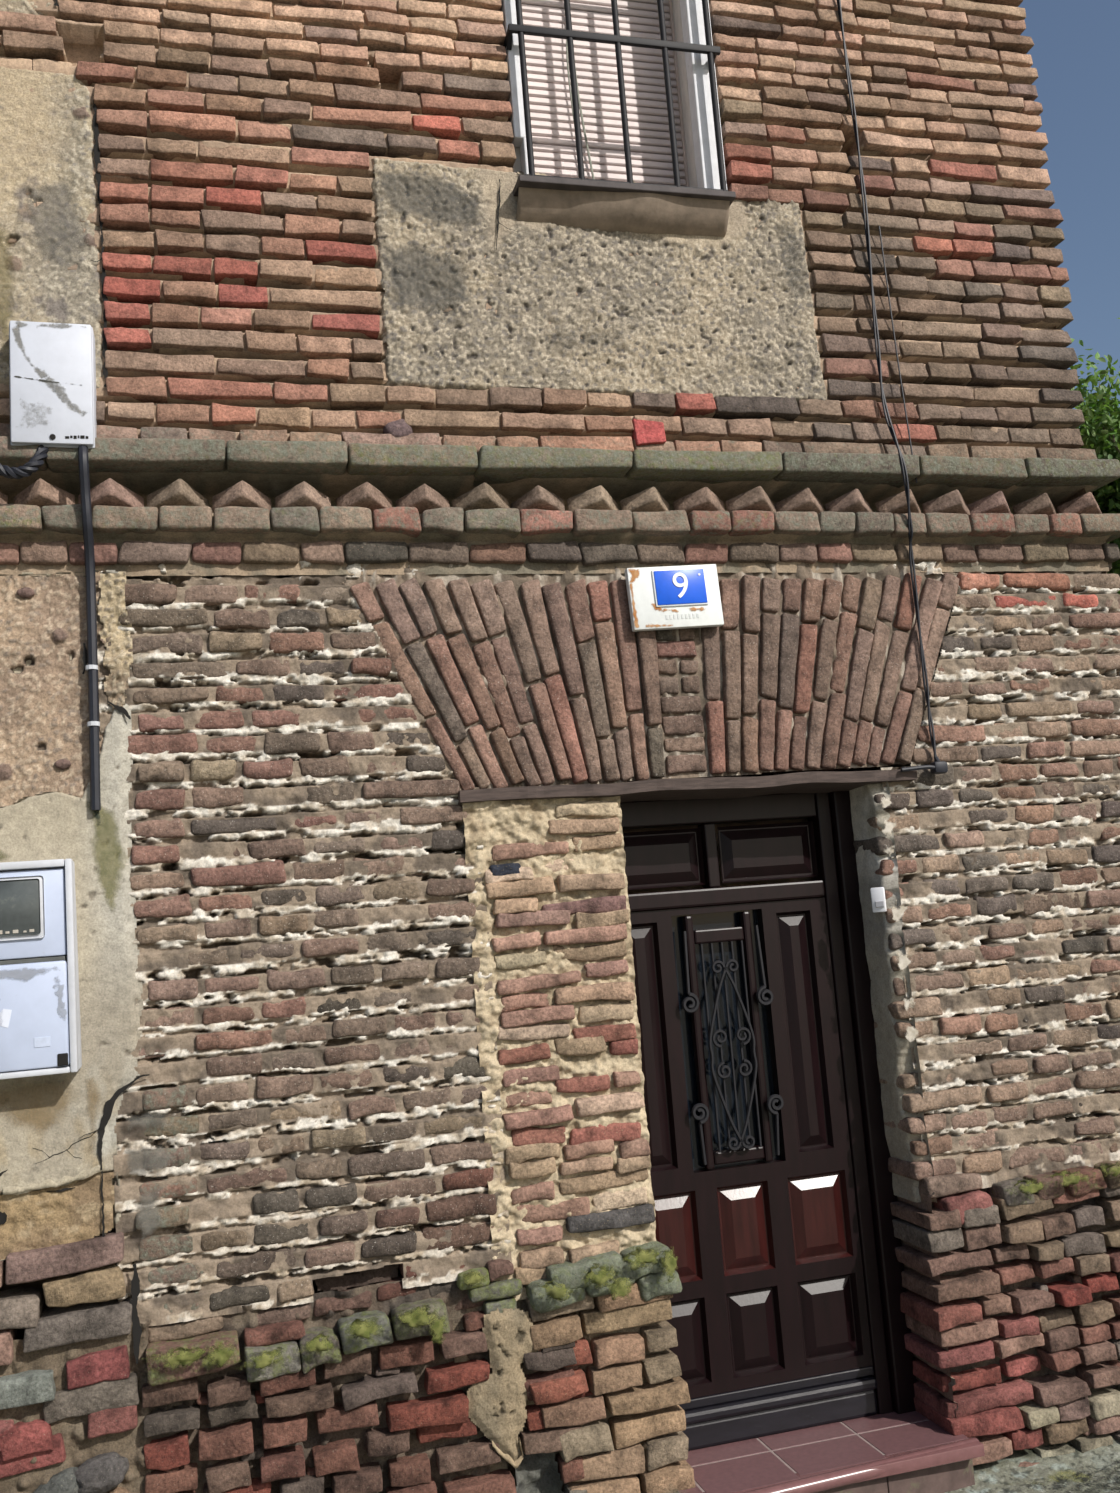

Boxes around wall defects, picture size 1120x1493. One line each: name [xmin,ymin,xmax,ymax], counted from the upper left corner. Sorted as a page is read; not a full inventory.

leakage [381,173,477,222]
leakage [393,247,466,314]
crack [0,1074,150,1237]